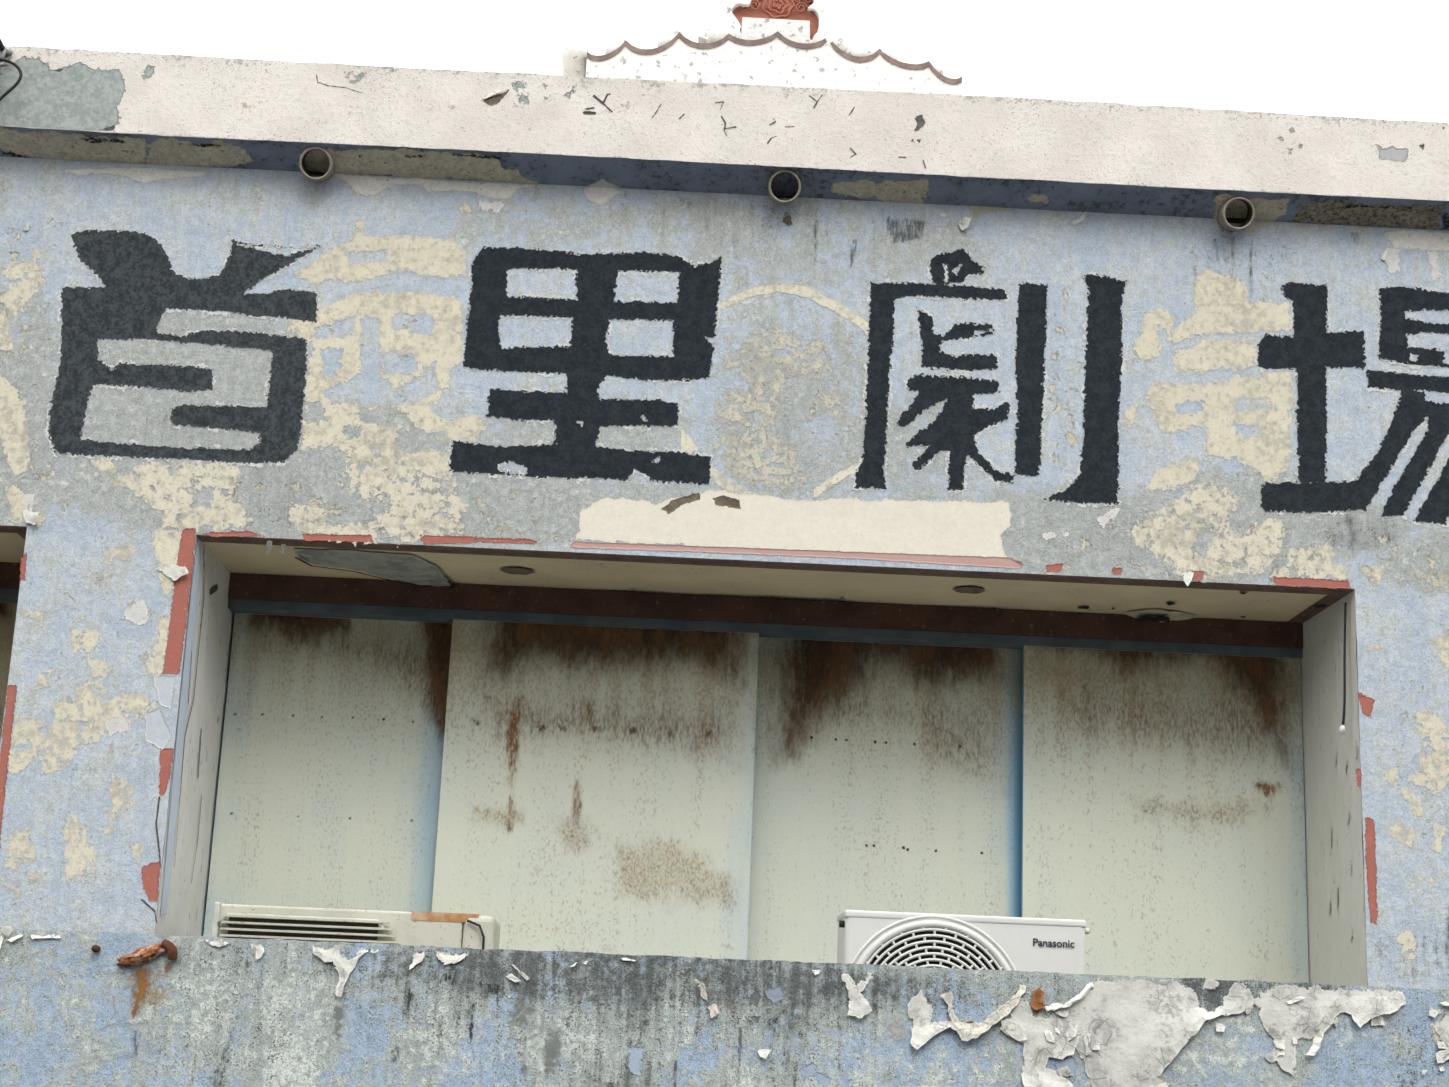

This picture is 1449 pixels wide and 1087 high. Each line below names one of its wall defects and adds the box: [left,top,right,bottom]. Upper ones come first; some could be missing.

spalling [0,56,253,183]
peeling [1213,193,1449,281]
peeling [1096,269,1351,608]
peeling [0,220,537,915]
peeling [1329,709,1449,924]
corrosion [132,964,169,1017]
peeling [312,945,378,997]
peeling [409,951,468,970]
damp [480,982,533,1026]
damp [544,1018,566,1074]
peeling [907,976,1406,1087]
peeling [1422,1001,1449,1075]